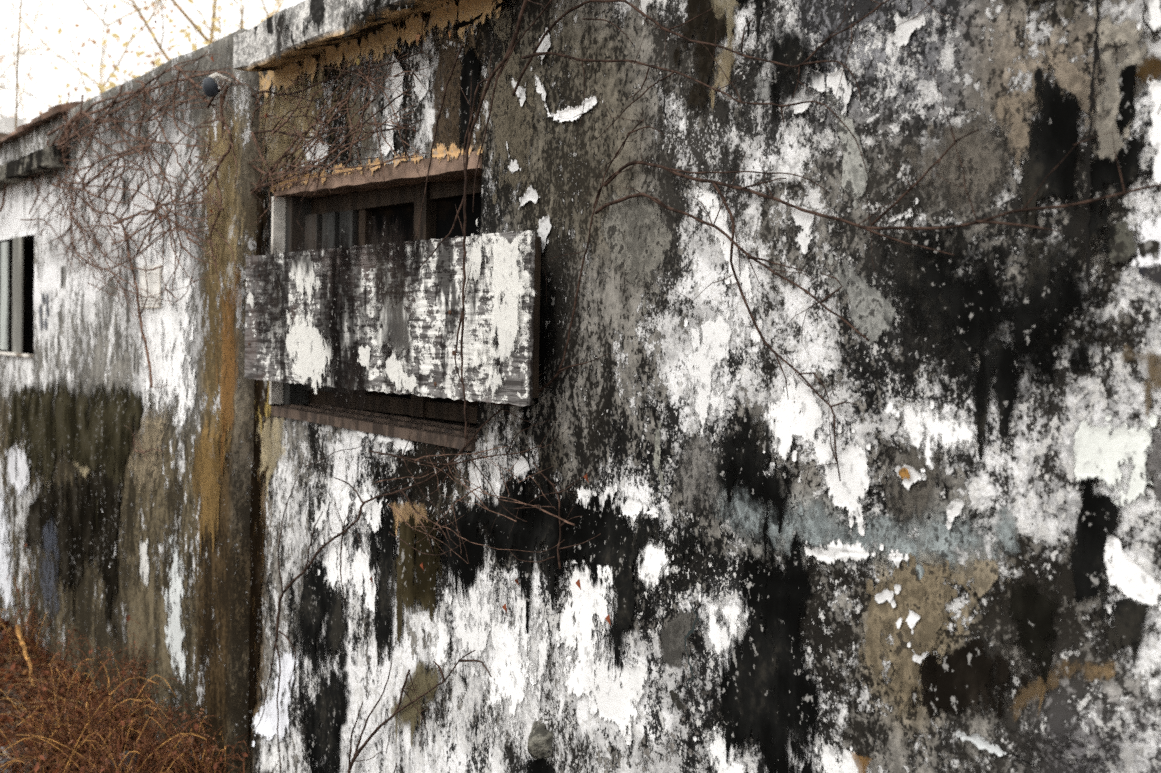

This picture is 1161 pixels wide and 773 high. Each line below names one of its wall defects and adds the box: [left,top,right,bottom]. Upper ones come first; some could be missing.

peeling [259,0,603,209]
spalling [1043,0,1161,184]
leakage [880,55,1161,464]
leakage [7,377,147,638]
leakage [192,188,423,556]
peeling [310,483,387,623]
leakage [368,471,713,678]
peeling [426,560,749,764]
leakage [714,412,830,773]
leakage [910,477,1149,720]
peeling [1070,412,1161,507]
peeling [1103,528,1161,628]